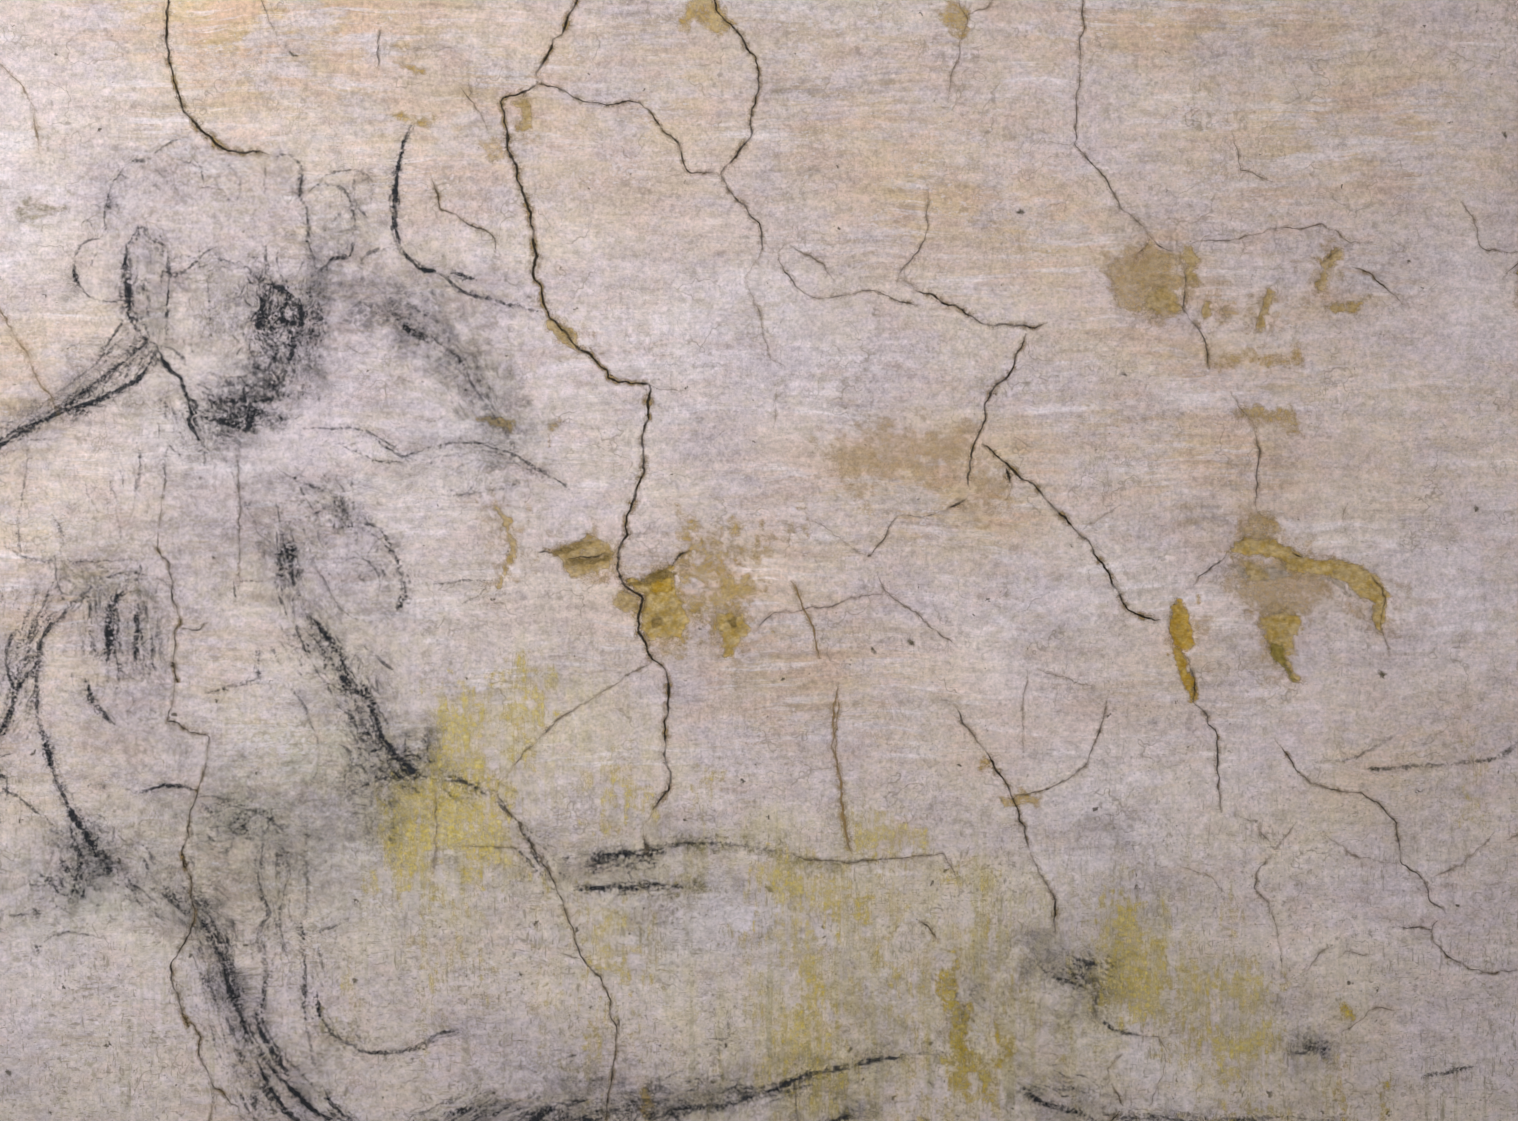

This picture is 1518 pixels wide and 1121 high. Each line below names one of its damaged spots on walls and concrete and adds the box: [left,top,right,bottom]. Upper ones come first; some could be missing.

crack [163,0,264,156]
crack [433,0,1163,810]
spalling [552,532,690,653]
spalling [714,607,751,657]
spalling [1167,596,1199,703]
spalling [1260,603,1301,682]
spalling [1230,516,1391,631]
crack [156,544,233,1118]
crack [797,692,952,868]
crack [959,707,1106,843]
crack [1280,745,1511,975]
crack [499,799,617,1121]